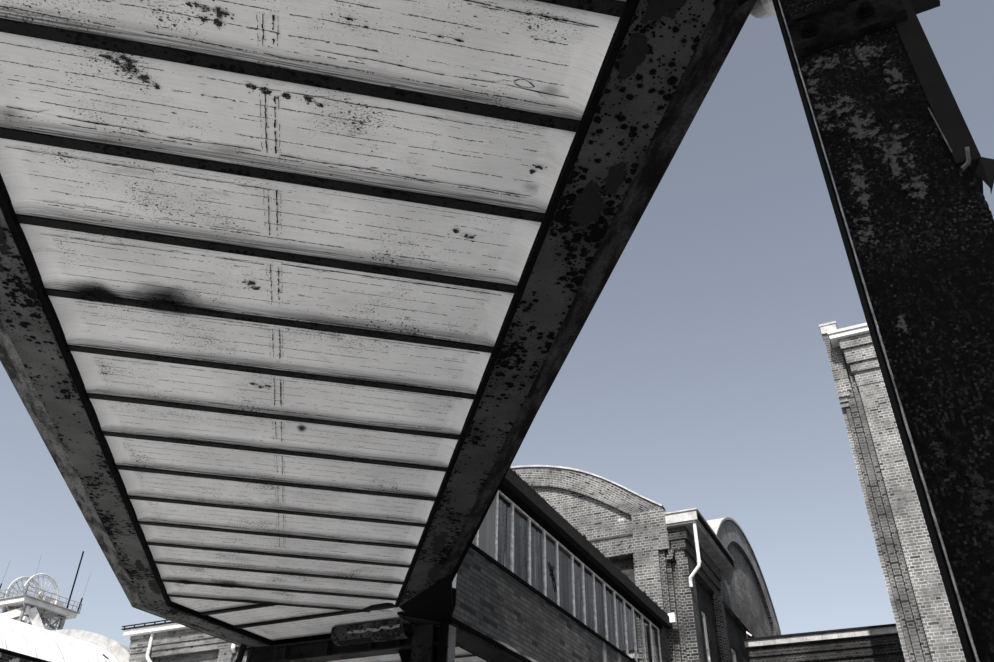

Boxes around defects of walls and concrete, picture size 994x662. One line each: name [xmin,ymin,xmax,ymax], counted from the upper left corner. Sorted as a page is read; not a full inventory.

water stain [84,289,119,301]
water stain [157,301,213,314]